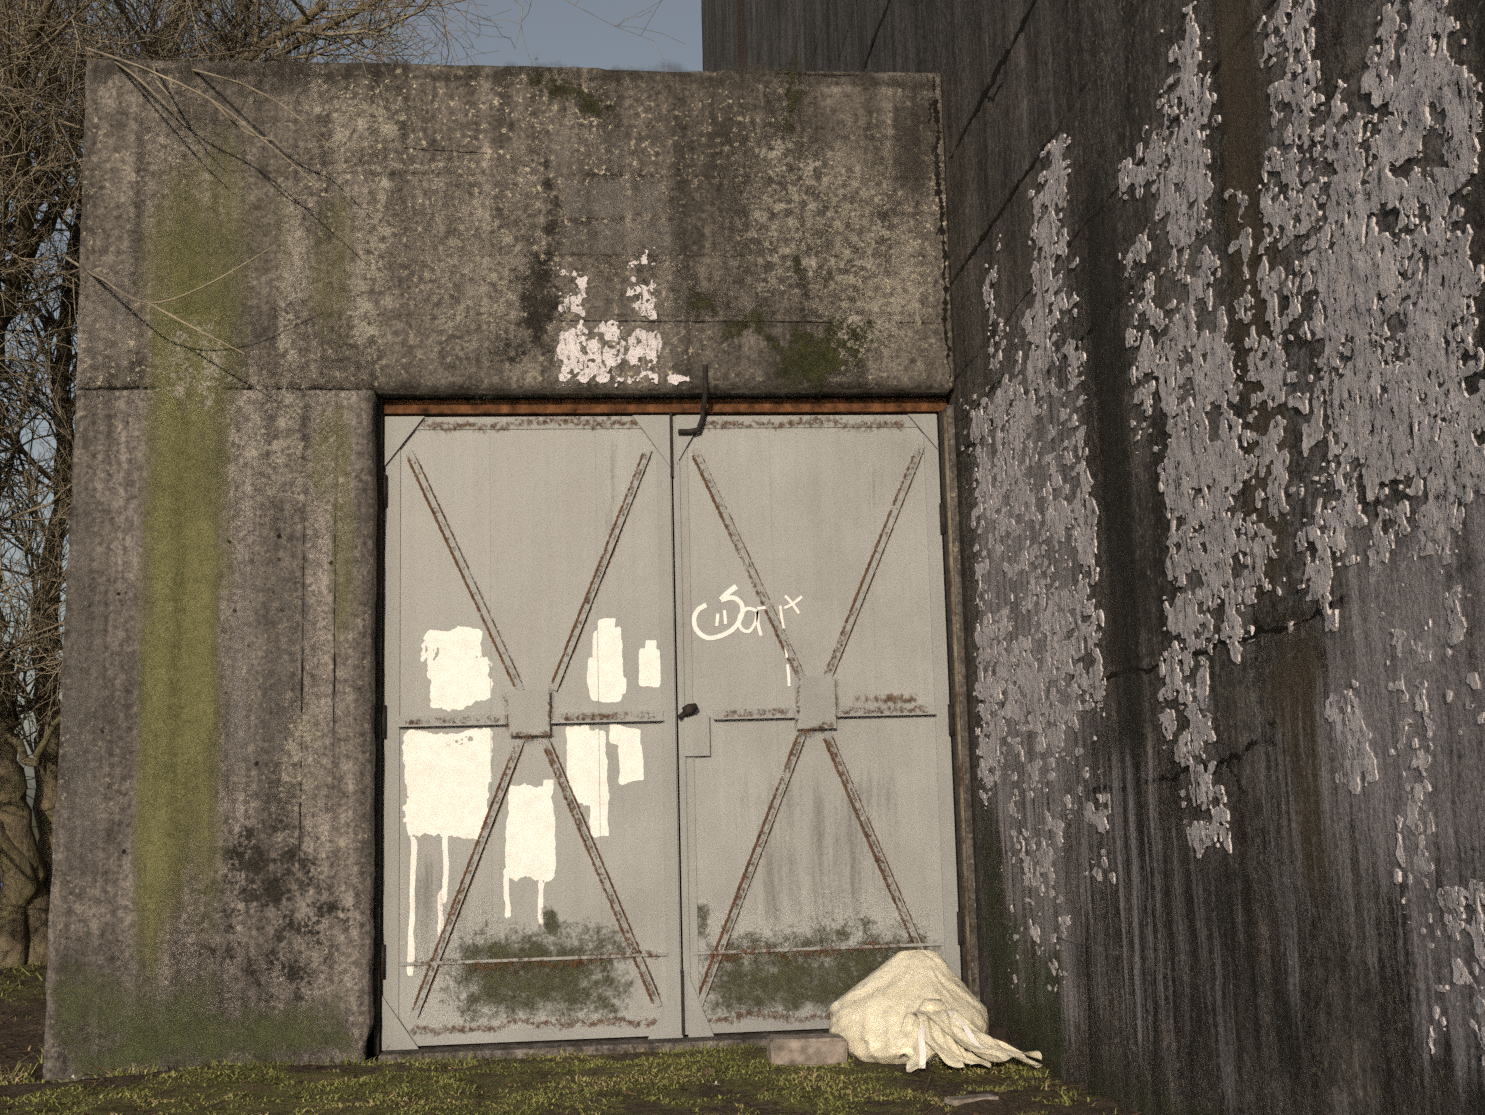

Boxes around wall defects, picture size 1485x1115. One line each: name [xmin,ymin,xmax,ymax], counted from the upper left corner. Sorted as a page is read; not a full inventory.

water stain [135,152,361,999]
water stain [347,162,445,360]
rust [407,453,660,1034]
peeling [555,247,689,387]
rust [709,1011,831,1024]
rust [692,452,927,1000]
water stain [735,134,933,366]
crack [534,0,1273,452]
peeling [960,133,1116,999]
water stain [1218,0,1277,578]
peeling [1118,0,1485,1065]
water stain [1276,474,1485,1115]